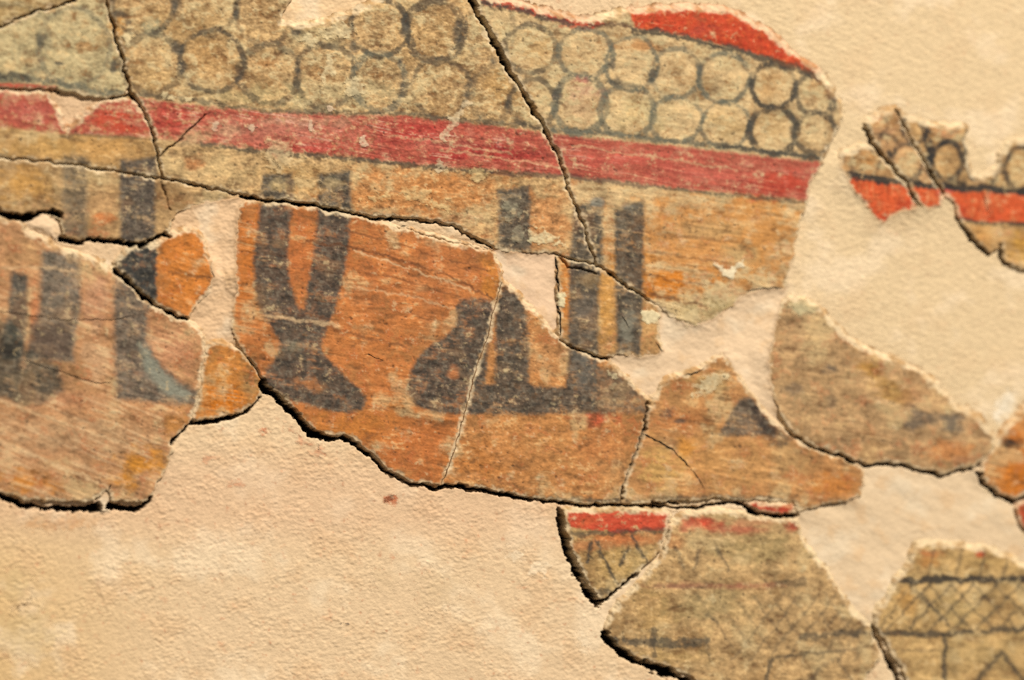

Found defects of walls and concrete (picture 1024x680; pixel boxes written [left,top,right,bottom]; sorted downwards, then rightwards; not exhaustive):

crack [468,0,506,72]
crack [0,0,491,250]
crack [0,269,185,321]
spalling [171,194,249,344]
spalling [490,197,569,330]
crack [522,96,646,359]
crack [170,283,792,603]
spalling [791,462,1024,623]